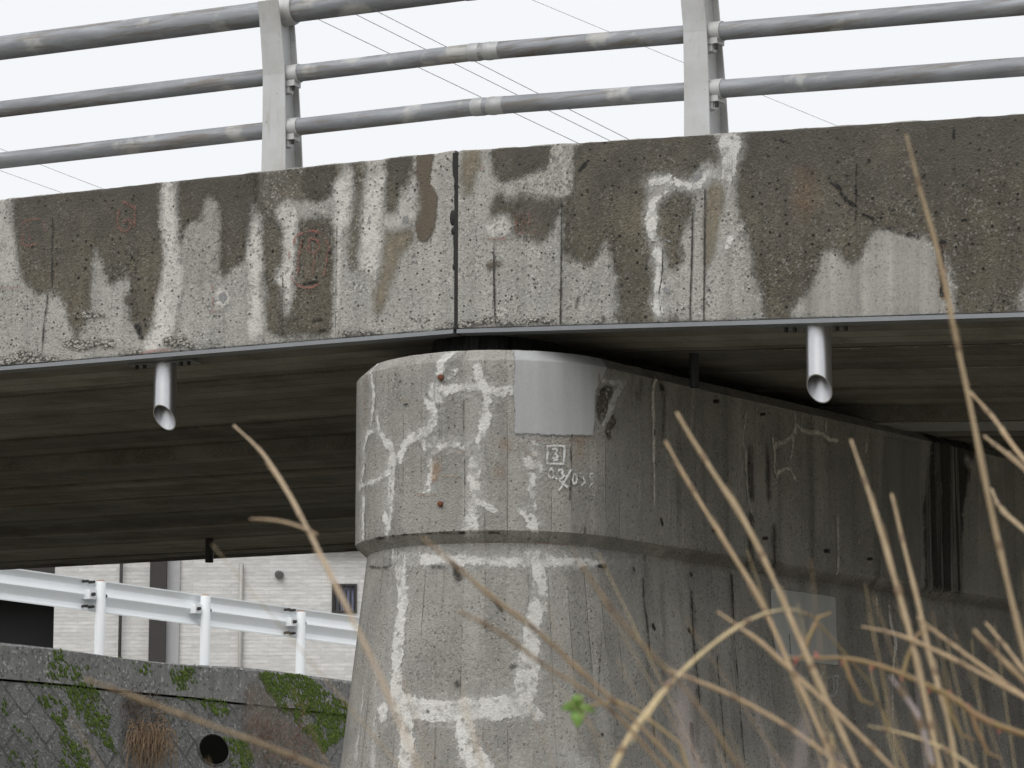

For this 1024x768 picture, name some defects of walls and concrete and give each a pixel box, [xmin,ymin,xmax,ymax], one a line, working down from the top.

leakage [0,154,438,354]
leakage [462,114,1024,323]
spalling [596,378,627,439]
crack [359,351,650,768]
crack [690,574,746,768]